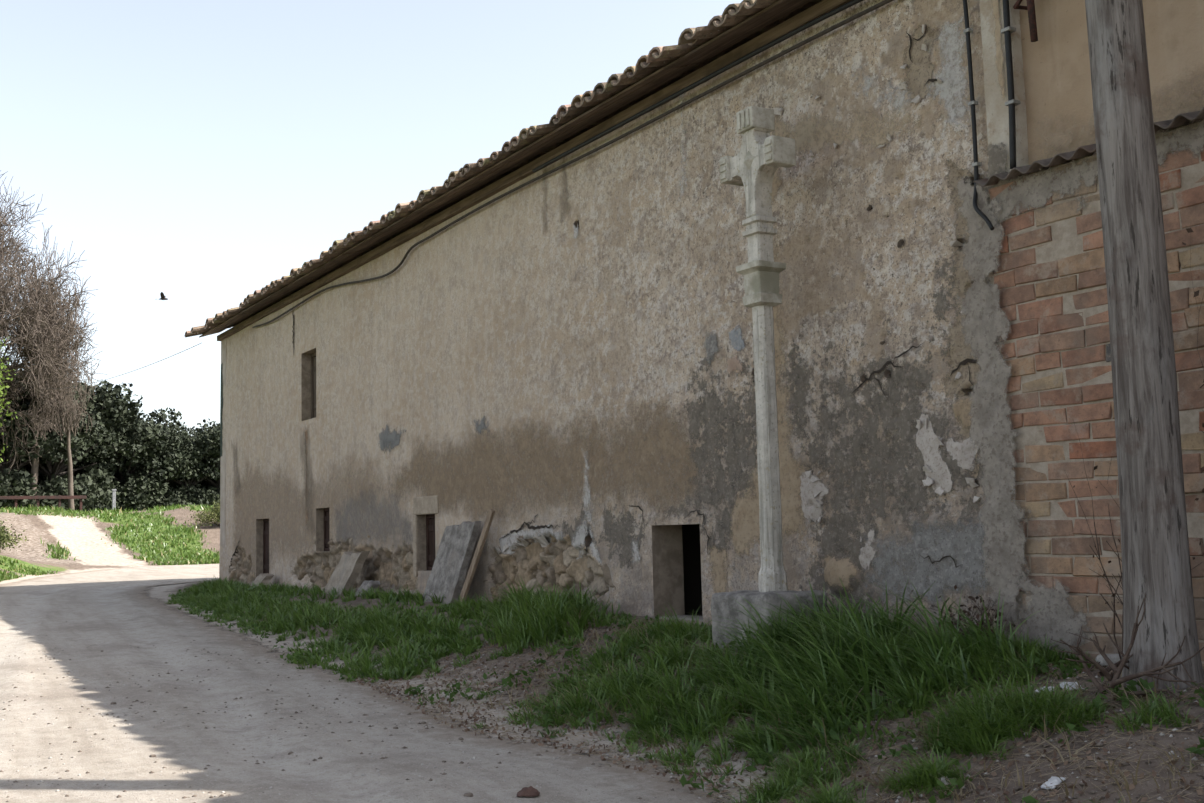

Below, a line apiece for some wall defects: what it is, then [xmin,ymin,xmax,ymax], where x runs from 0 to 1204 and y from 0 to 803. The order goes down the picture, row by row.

leakage [234,353,758,576]
spalling [731,468,760,555]
spalling [773,304,828,536]
leakage [776,257,984,617]
crack [852,343,923,399]
spalling [916,160,988,503]
crack [950,358,977,386]